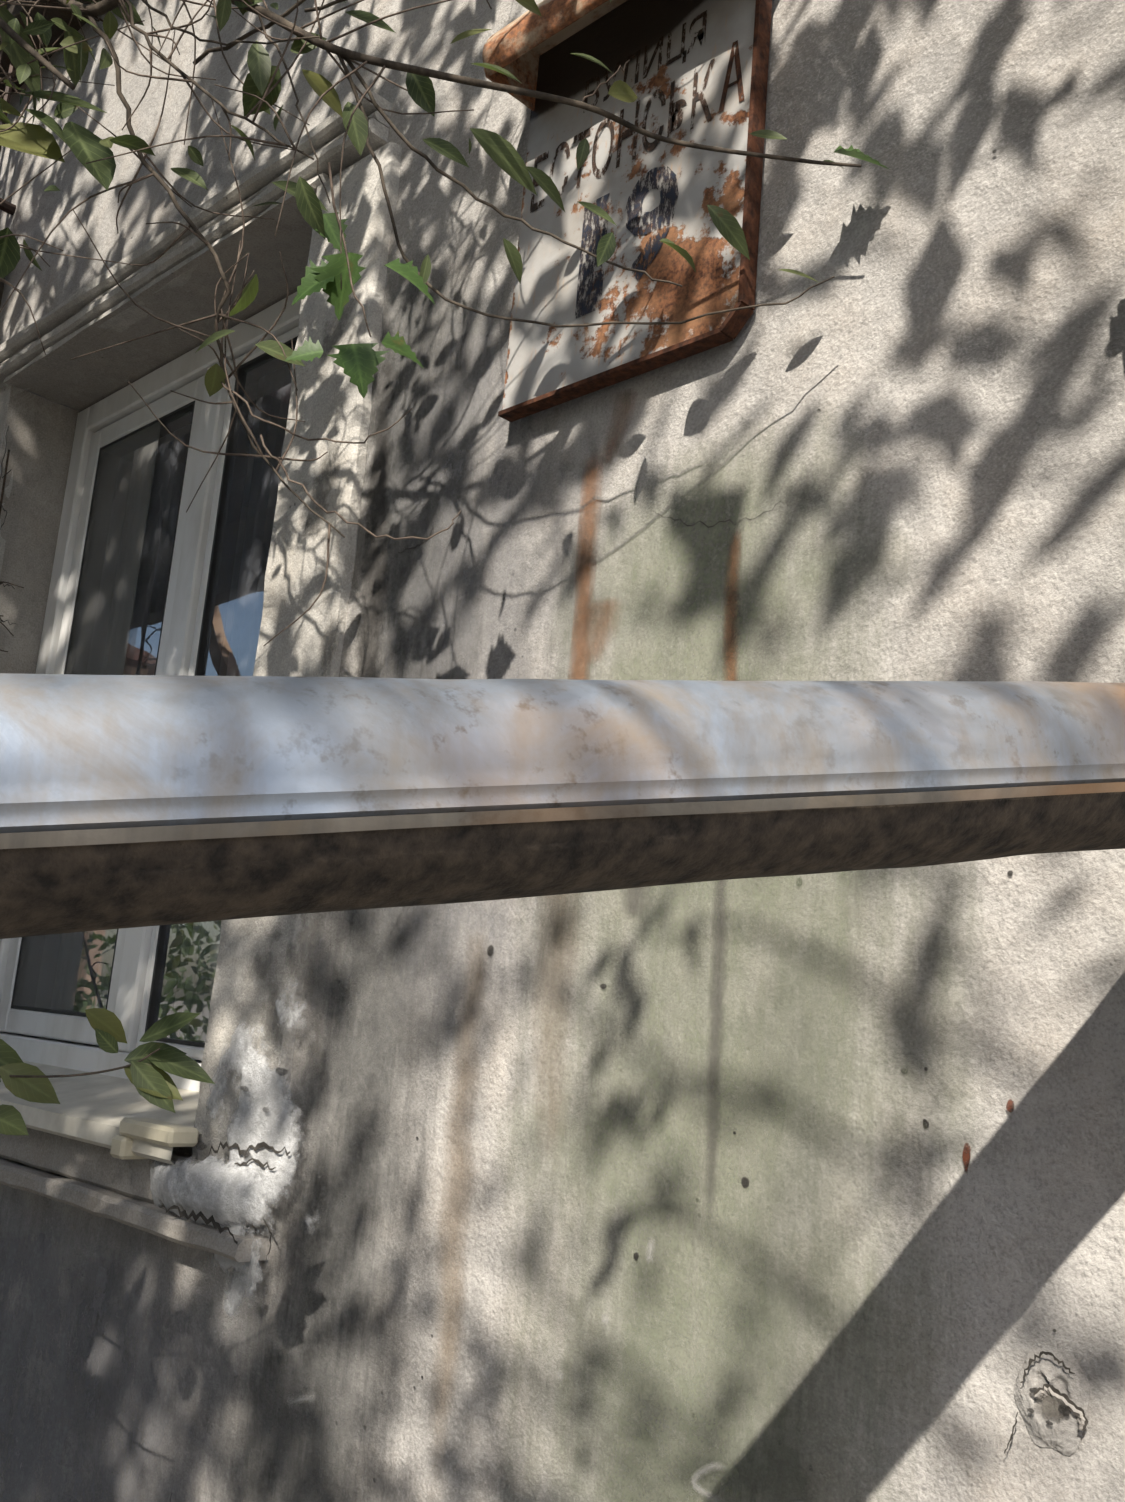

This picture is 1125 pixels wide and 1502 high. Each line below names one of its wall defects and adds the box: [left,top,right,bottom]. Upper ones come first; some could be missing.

peeling [322,299,354,357]
peeling [305,448,339,529]
peeling [321,616,339,671]
damp [358,278,535,679]
rust [573,467,596,680]
damp [603,469,843,681]
peeling [262,996,283,1037]
damp [240,905,428,1502]
damp [554,870,875,1502]